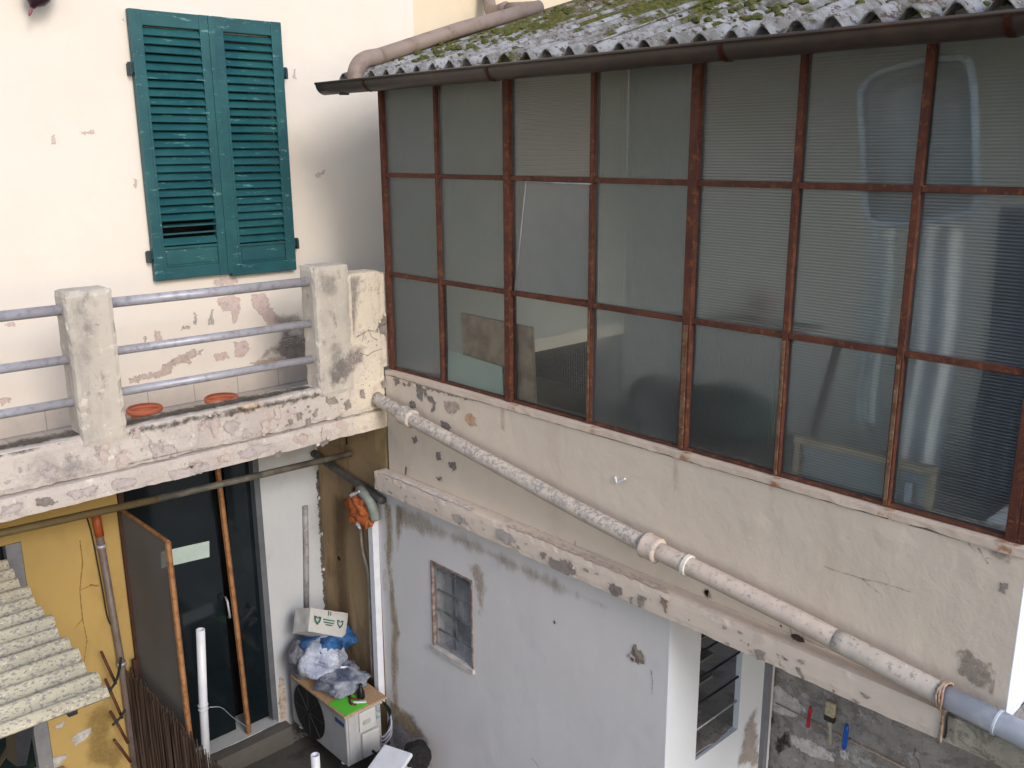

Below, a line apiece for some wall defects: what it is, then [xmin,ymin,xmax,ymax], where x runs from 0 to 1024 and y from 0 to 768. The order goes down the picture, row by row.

peeling [181,276,278,331]
peeling [129,340,282,383]
peeling [140,402,261,480]
peeling [277,361,477,447]
peeling [1,453,98,516]
peeling [496,525,669,613]